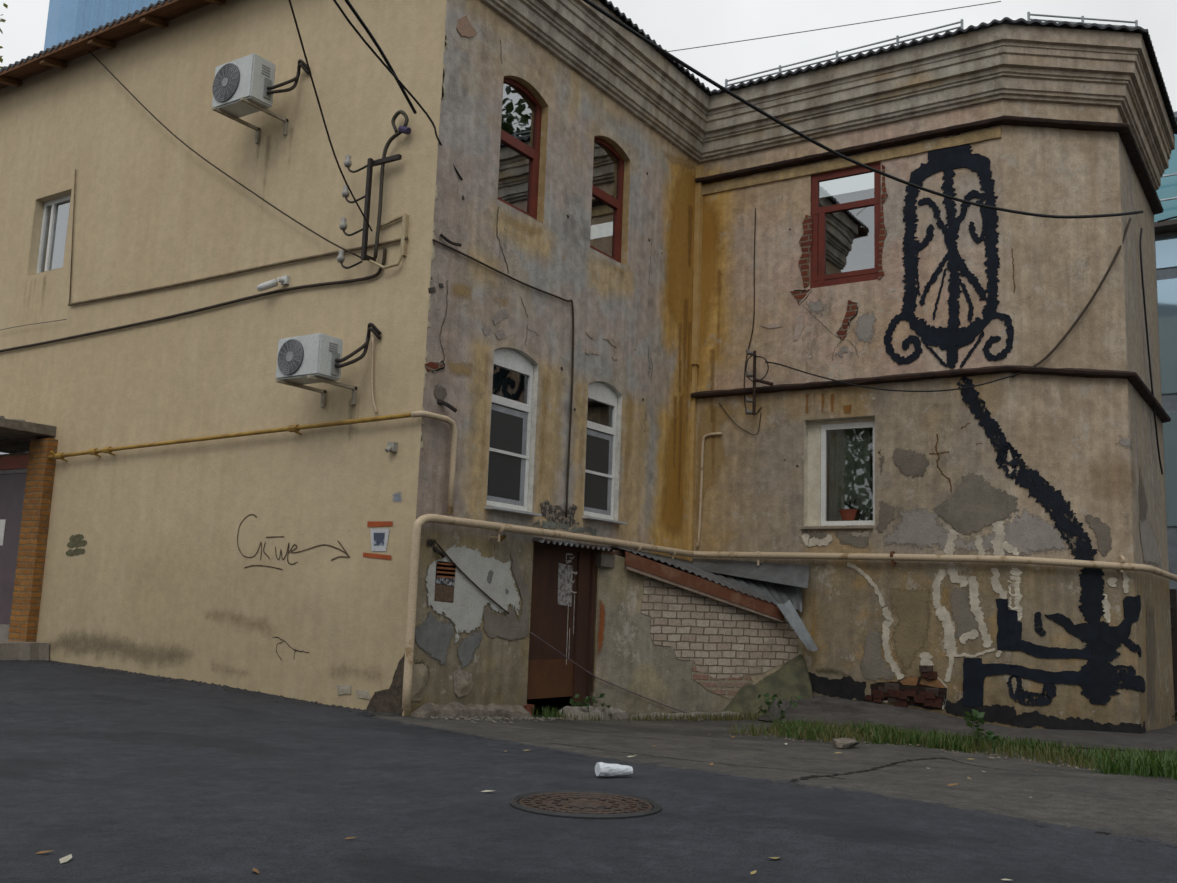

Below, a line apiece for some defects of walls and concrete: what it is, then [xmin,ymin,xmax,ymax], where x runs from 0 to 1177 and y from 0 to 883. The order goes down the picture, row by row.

spalling [789,215,813,304]
water stain [662,173,730,531]
spalling [835,300,860,340]
peeling [426,545,520,643]